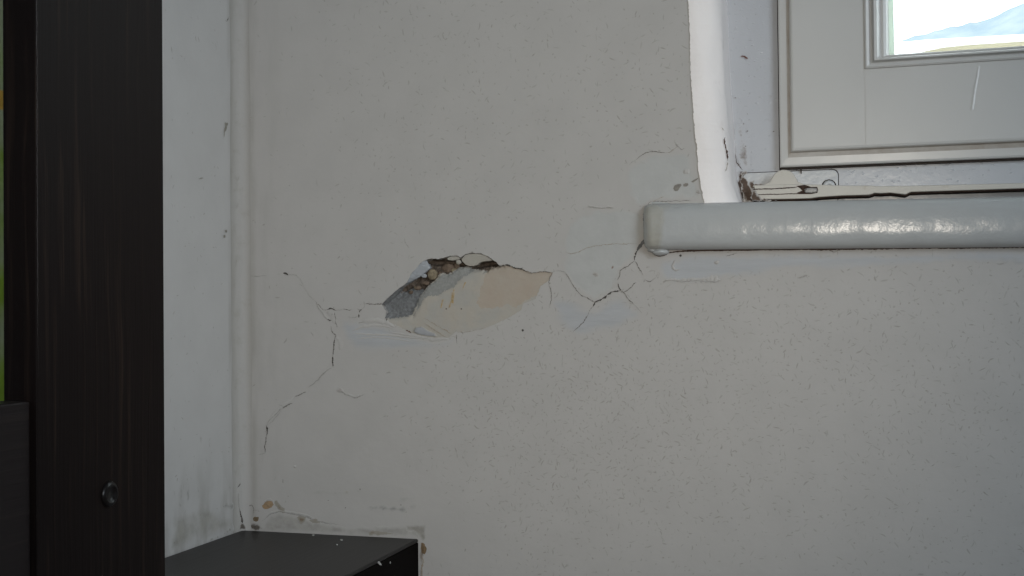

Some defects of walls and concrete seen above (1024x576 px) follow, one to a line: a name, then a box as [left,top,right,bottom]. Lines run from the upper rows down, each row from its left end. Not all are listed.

spalling [353,252,553,343]
crack [553,240,1024,330]
crack [256,272,382,455]